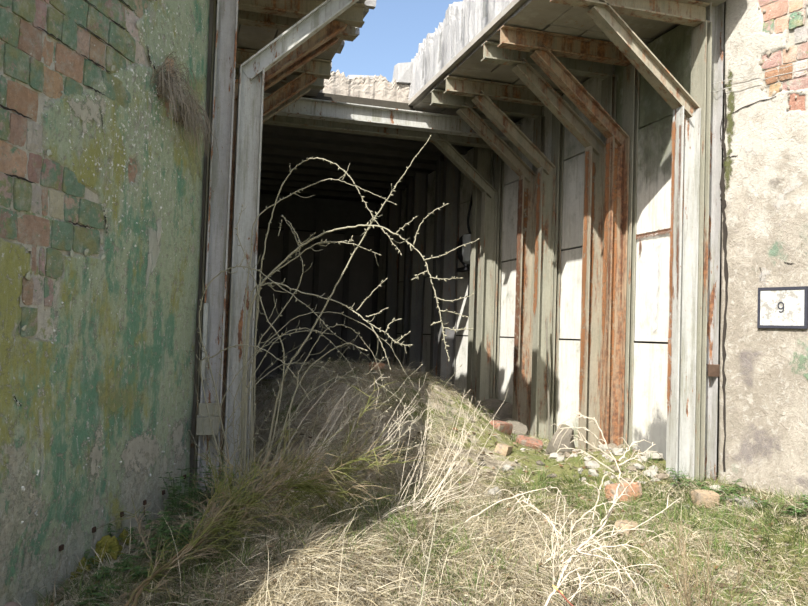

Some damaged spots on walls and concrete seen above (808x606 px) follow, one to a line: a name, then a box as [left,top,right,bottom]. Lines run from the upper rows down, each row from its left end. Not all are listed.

spalling [0,0,174,344]
rust [579,142,625,403]
rust [636,118,685,412]
crack [719,84,776,472]
spalling [758,0,808,111]